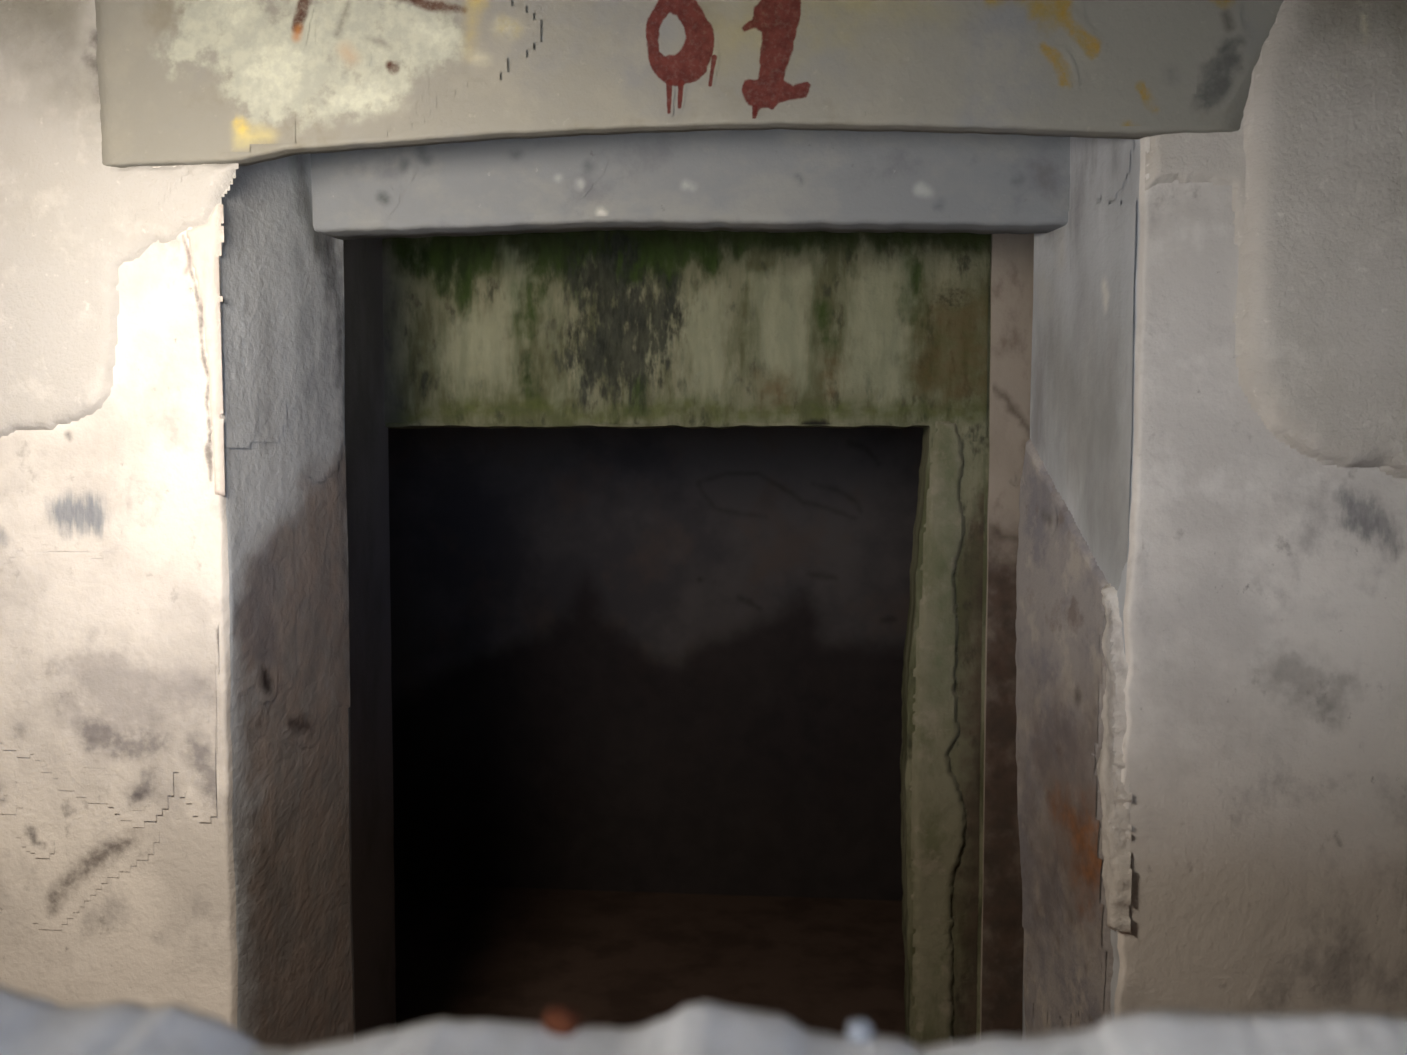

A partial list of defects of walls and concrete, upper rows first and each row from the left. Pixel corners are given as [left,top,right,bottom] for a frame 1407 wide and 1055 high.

damp [0,214,354,1049]
peeling [186,204,225,495]
damp [368,144,442,215]
damp [382,230,980,426]
spalling [0,421,1407,1055]
damp [948,462,1024,1042]